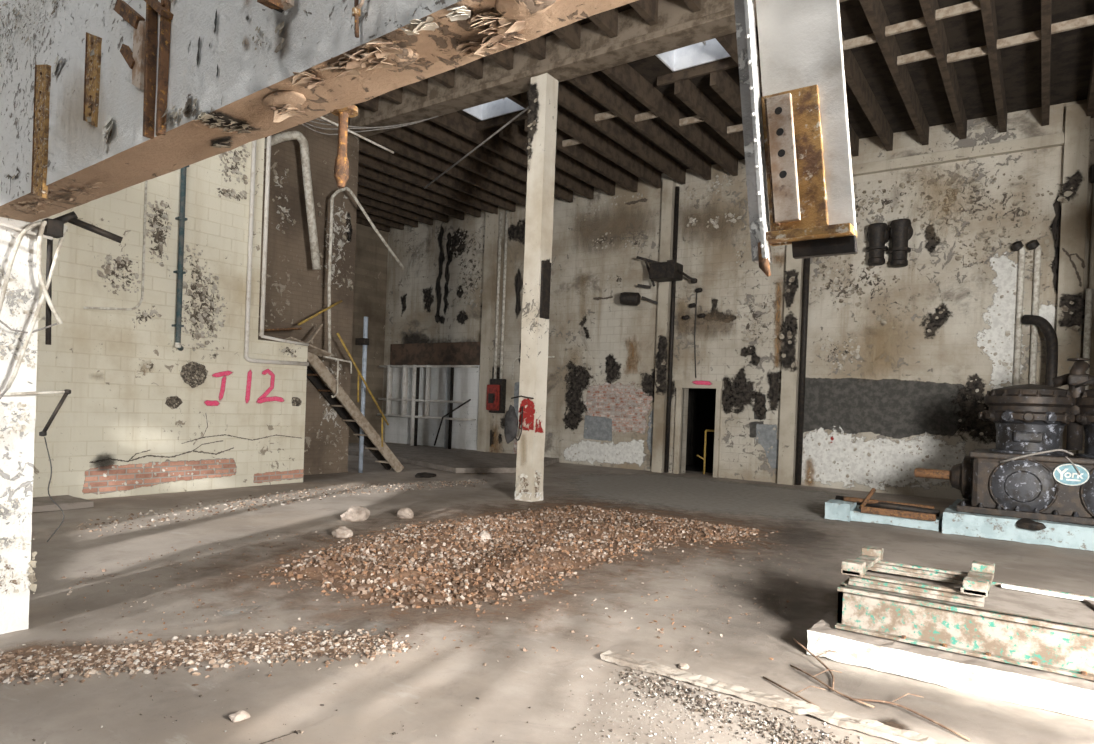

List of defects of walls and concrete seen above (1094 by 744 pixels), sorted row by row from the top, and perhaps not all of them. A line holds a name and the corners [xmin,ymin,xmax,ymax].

peeling [400,6,526,58]
peeling [288,38,403,89]
peeling [266,104,305,122]
peeling [736,294,795,368]
flaking render [796,170,1080,490]
crack [89,416,298,463]
spalling [564,382,660,467]
spalling [749,394,779,469]
spalling [82,458,237,494]
peeling [515,470,543,497]
spalling [0,536,37,594]
crack [260,730,303,744]